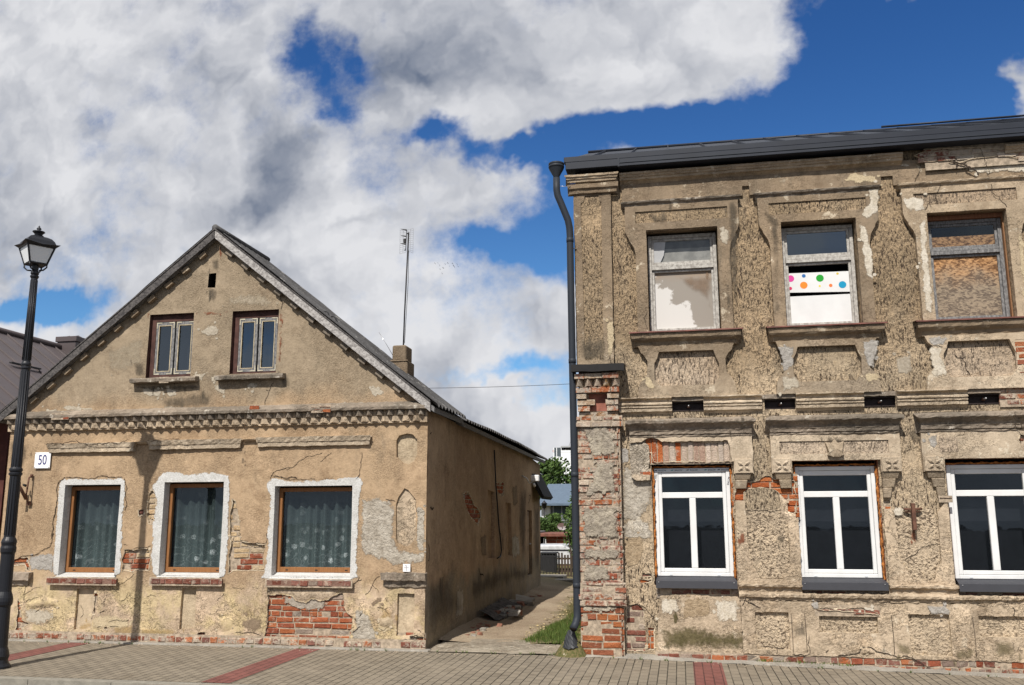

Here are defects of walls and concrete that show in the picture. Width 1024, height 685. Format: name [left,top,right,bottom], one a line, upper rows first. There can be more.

flaking render [901,141,1024,177]
crack [270,452,332,480]
flaking render [121,547,152,573]
flaking render [227,499,266,575]
flaking render [359,494,426,565]
flaking render [579,427,800,584]
flaking render [242,592,384,639]
flaking render [583,593,738,652]